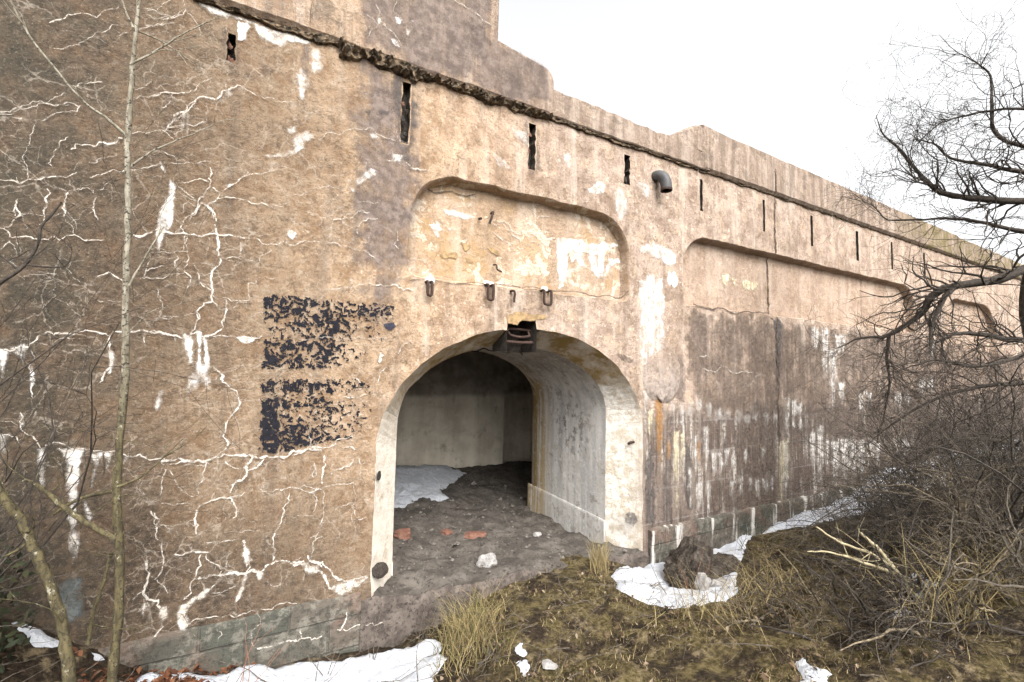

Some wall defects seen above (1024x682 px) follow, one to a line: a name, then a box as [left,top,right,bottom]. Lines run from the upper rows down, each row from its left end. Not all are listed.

crack [145,0,201,35]
crack [0,79,629,382]
peeling [556,238,620,288]
peeling [641,244,676,265]
spalling [507,312,546,325]
efflorescence [639,276,664,359]
peeling [258,294,394,454]
crack [344,337,411,398]
leakage [670,309,1024,512]
crack [4,370,383,649]
leakage [645,449,655,523]